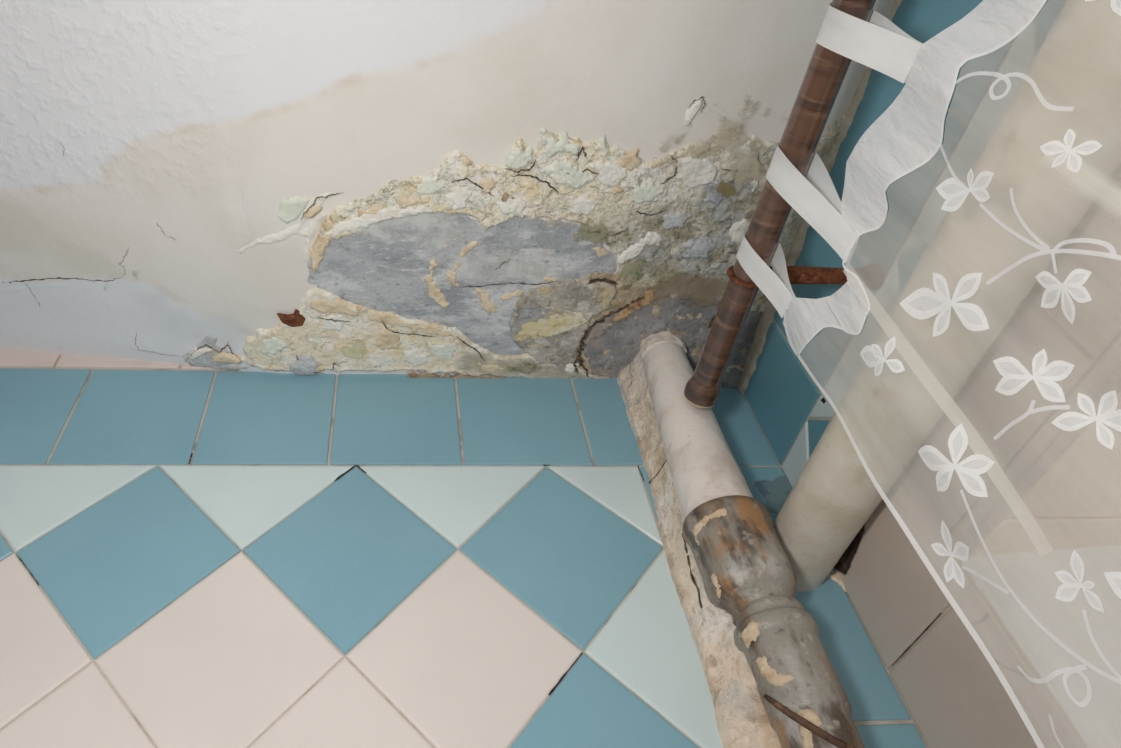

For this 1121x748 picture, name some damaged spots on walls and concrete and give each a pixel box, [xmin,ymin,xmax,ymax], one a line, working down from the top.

water stain [873,0,895,19]
peeling [685,96,706,126]
peeling [815,107,849,166]
water stain [818,60,867,143]
water stain [0,0,832,370]
crack [0,248,129,307]
peeling [182,127,778,389]
peeling [779,208,803,257]
rust [277,309,305,327]
crack [573,277,645,378]
crack [895,597,954,662]